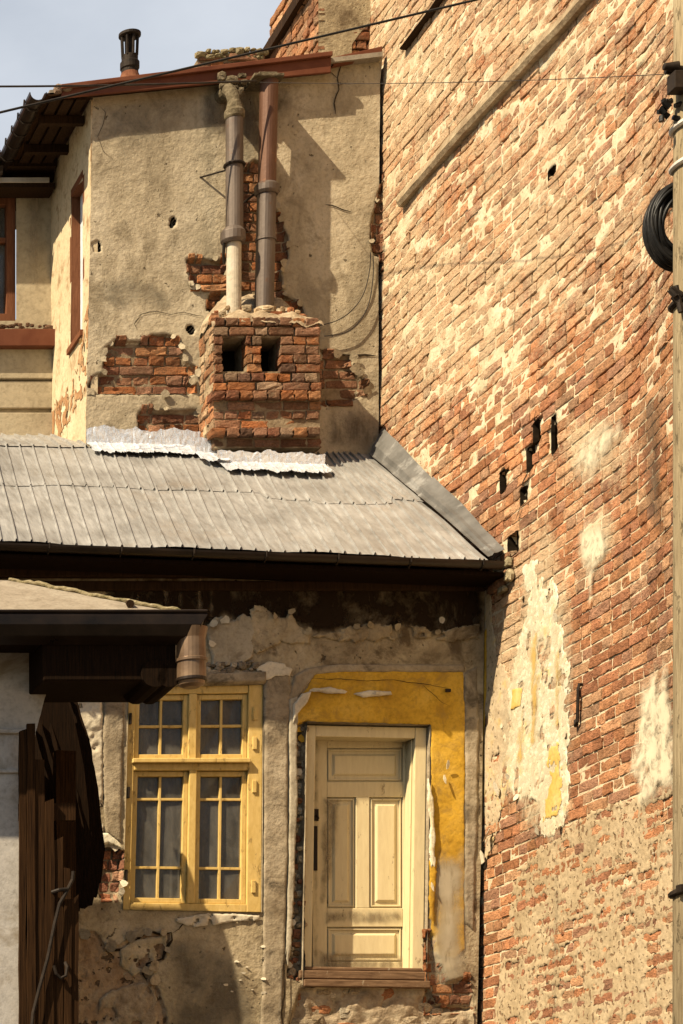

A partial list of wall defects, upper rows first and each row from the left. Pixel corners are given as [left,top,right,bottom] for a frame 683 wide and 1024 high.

crack [331,67,342,114]
spalling [186,253,226,311]
spalling [241,160,258,297]
spalling [274,202,305,314]
spalling [51,304,202,437]
spalling [320,348,375,407]
flaking render [78,702,104,805]
spalling [207,559,673,1024]
spalling [98,824,128,903]
spalling [78,913,260,1024]